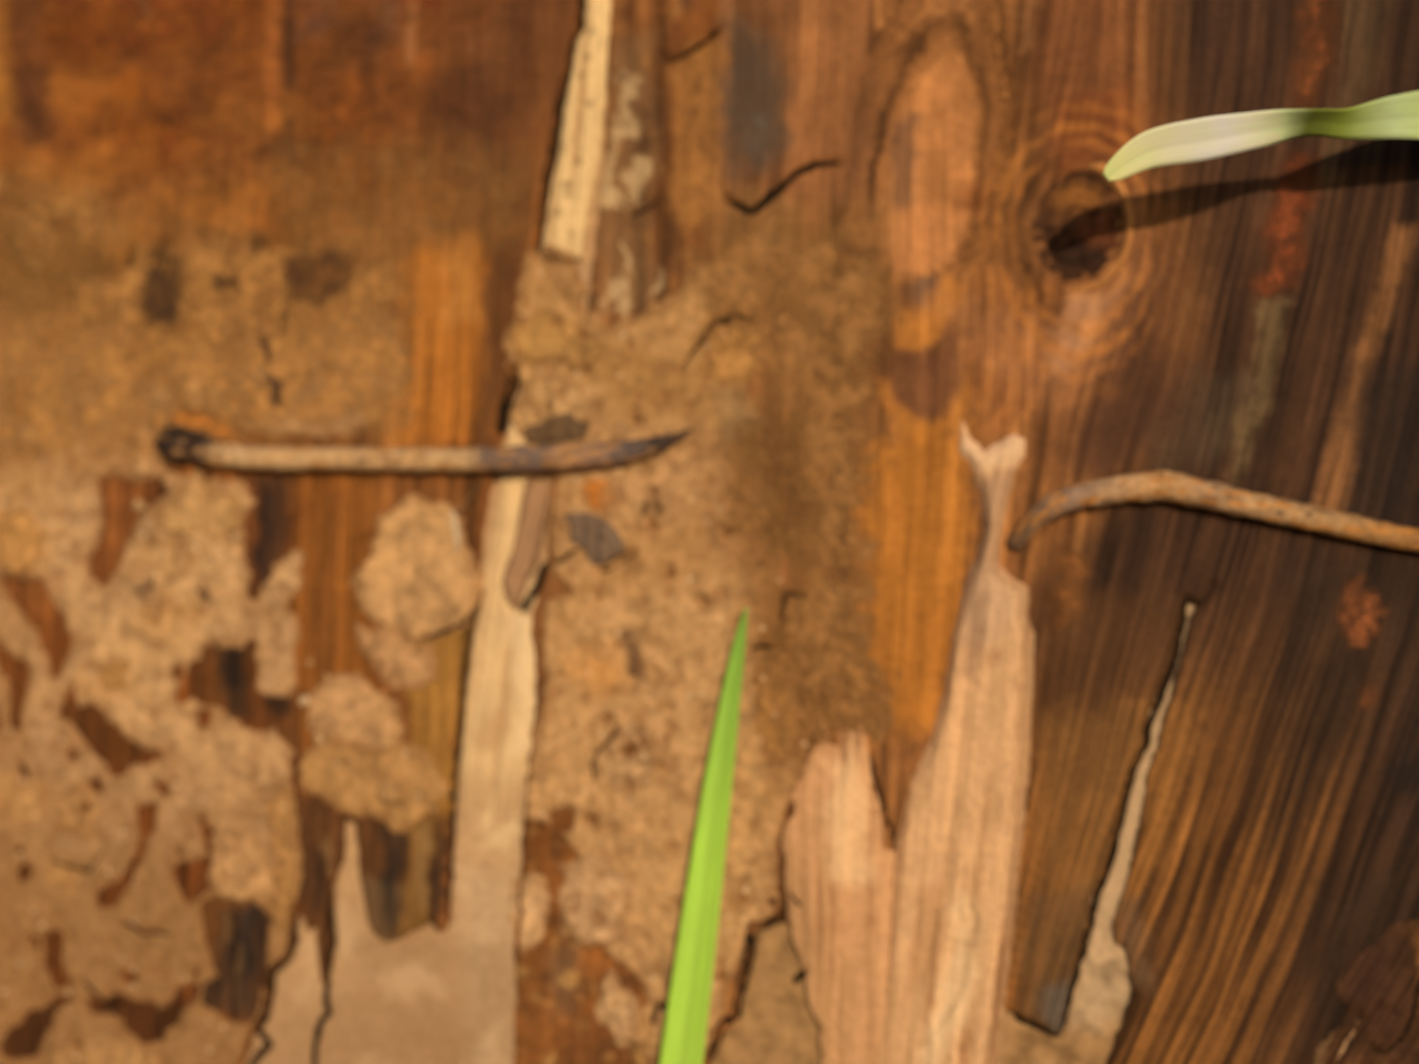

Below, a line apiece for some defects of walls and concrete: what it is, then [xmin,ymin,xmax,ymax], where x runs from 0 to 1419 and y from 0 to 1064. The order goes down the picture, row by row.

crack [667,27,723,63]
crack [536,0,586,257]
crack [726,161,841,215]
crack [495,370,520,436]
peeling [506,307,608,425]
peeling [591,728,661,797]
crack [1013,584,1214,1038]
peeling [210,823,278,904]
peeling [557,849,634,946]
peeling [47,1027,170,1064]
peeling [595,968,640,1048]
peeling [1314,919,1419,1064]